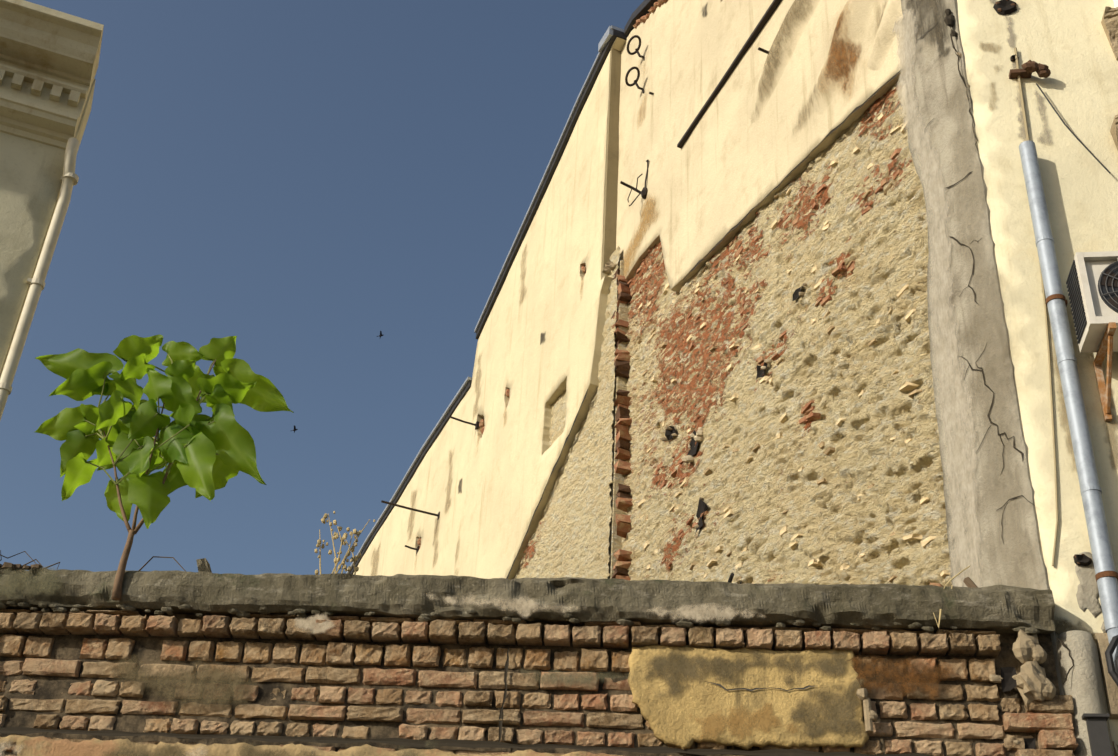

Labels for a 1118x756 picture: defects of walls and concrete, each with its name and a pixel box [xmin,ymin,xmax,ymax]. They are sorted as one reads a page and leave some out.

spalling [633,0,668,28]
leakage [759,0,806,97]
rust [827,16,860,90]
leakage [906,0,949,56]
leakage [1035,92,1050,143]
crack [948,236,982,305]
spalling [513,79,952,587]
peeling [0,734,618,756]